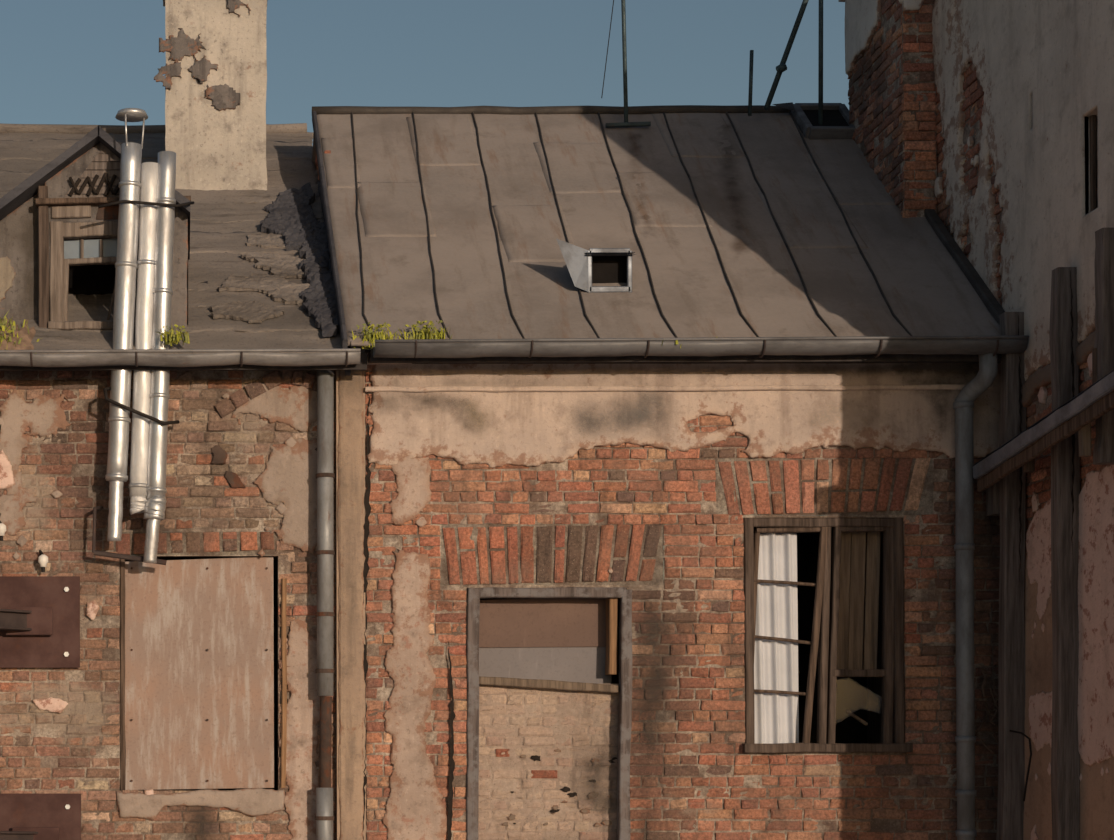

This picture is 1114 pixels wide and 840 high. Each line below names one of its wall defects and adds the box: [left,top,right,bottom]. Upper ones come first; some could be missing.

spalling [154,28,240,111]
spalling [227,0,251,17]
spalling [848,0,971,258]
spalling [961,61,1004,306]
flaking render [0,389,72,560]
spalling [687,414,749,458]
peeling [1026,448,1051,640]
peeling [1077,420,1114,782]